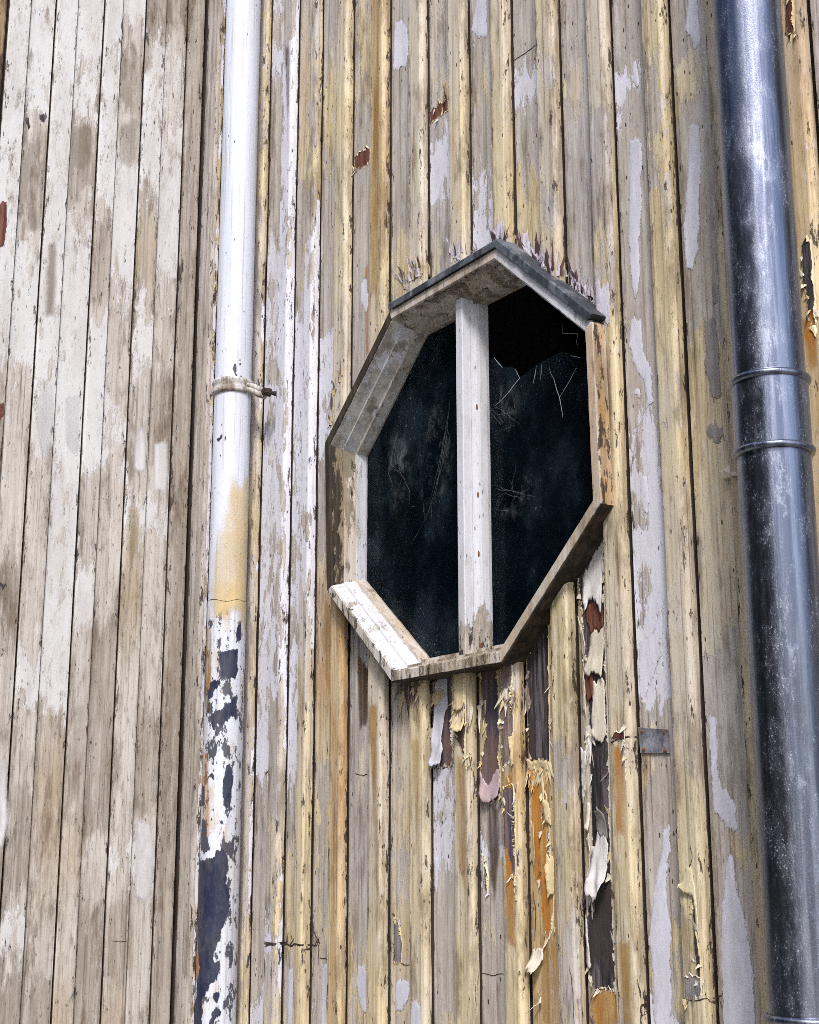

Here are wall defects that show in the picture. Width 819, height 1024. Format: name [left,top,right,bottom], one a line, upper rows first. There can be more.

peeling [430,81,449,124]
peeling [352,145,371,175]
peeling [394,251,432,292]
peeling [446,238,479,262]
peeling [489,218,610,328]
peeling [799,235,819,337]
peeling [392,625,555,975]
peeling [577,539,630,1024]
crack [264,927,327,965]